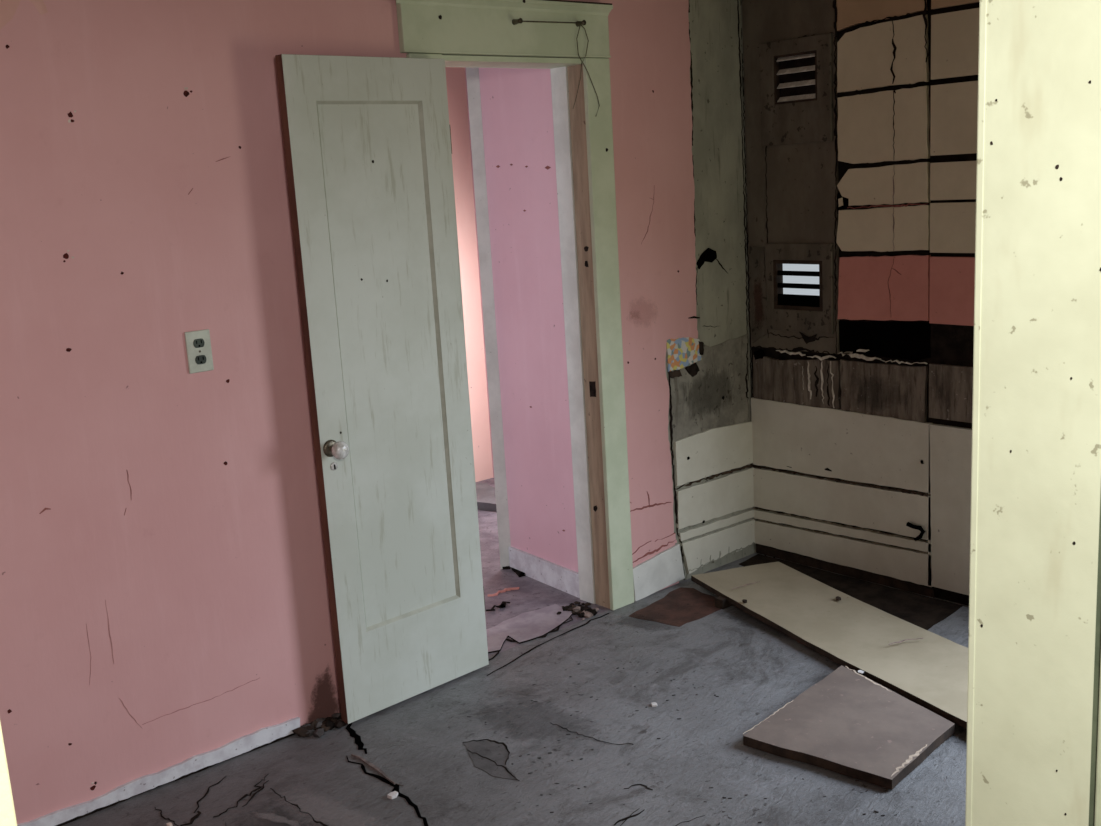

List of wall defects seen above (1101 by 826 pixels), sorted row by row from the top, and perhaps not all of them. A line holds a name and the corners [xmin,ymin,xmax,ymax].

crack [346,723,428,826]
crack [614,784,653,826]